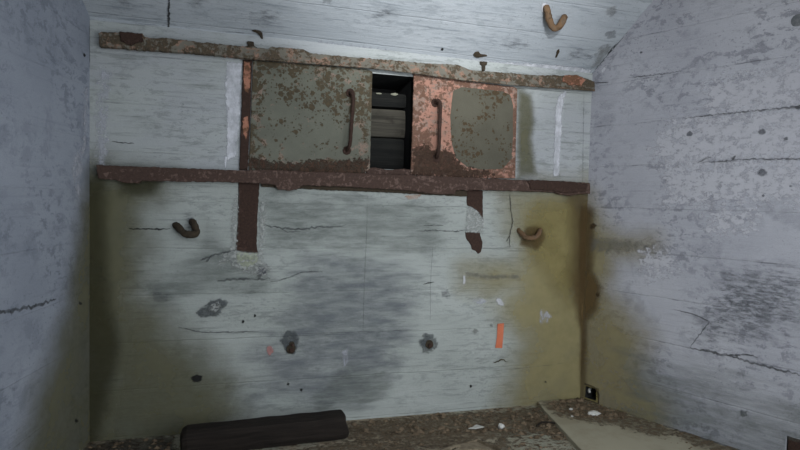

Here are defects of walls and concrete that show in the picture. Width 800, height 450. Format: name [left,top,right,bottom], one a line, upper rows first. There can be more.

corrosion [411,143,497,179]
spalling [466,208,484,233]
leakage [490,195,661,424]
crack [678,310,795,374]